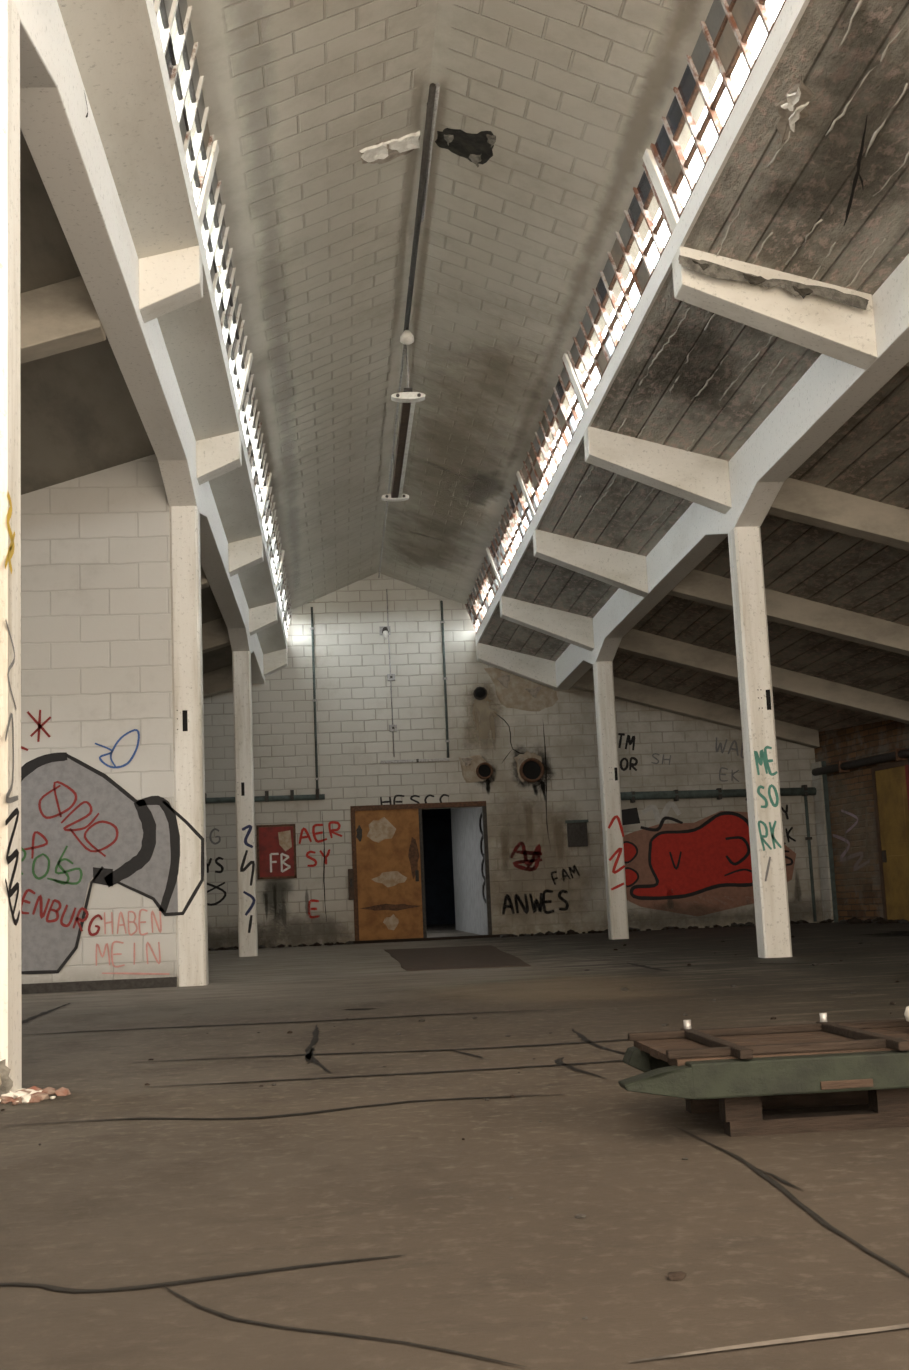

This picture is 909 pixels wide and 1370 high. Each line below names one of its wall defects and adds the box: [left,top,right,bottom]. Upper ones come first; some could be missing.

crack [0,1254,526,1367]